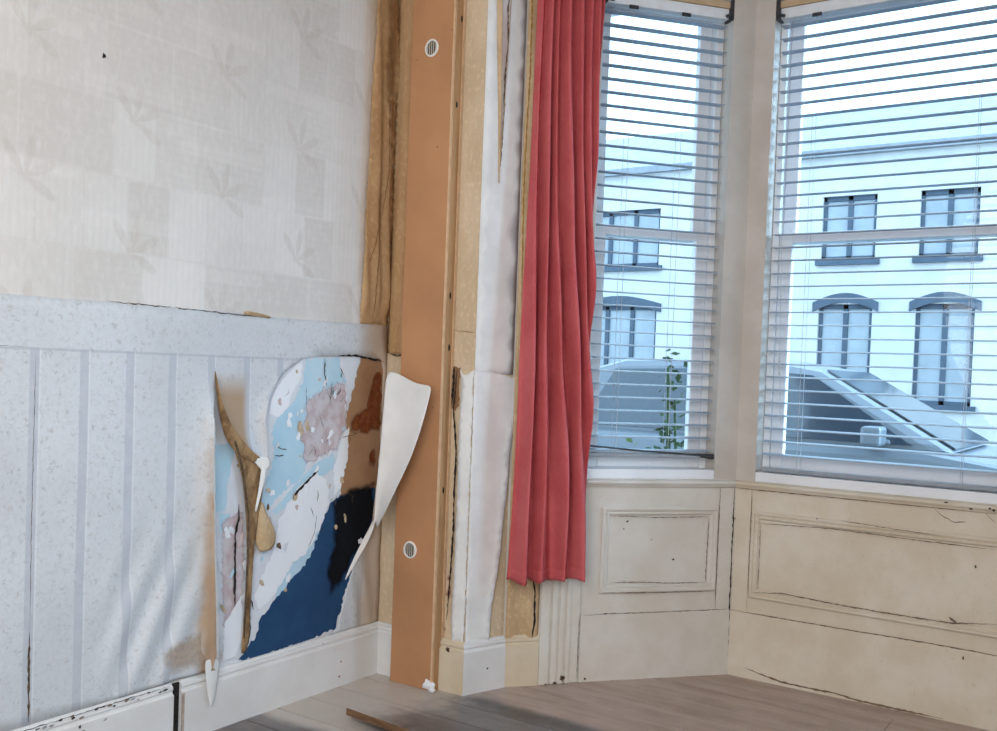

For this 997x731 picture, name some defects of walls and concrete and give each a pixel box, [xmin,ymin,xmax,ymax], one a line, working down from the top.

flaking render [497,0,511,151]
flaking render [214,357,383,667]
crack [576,487,997,719]